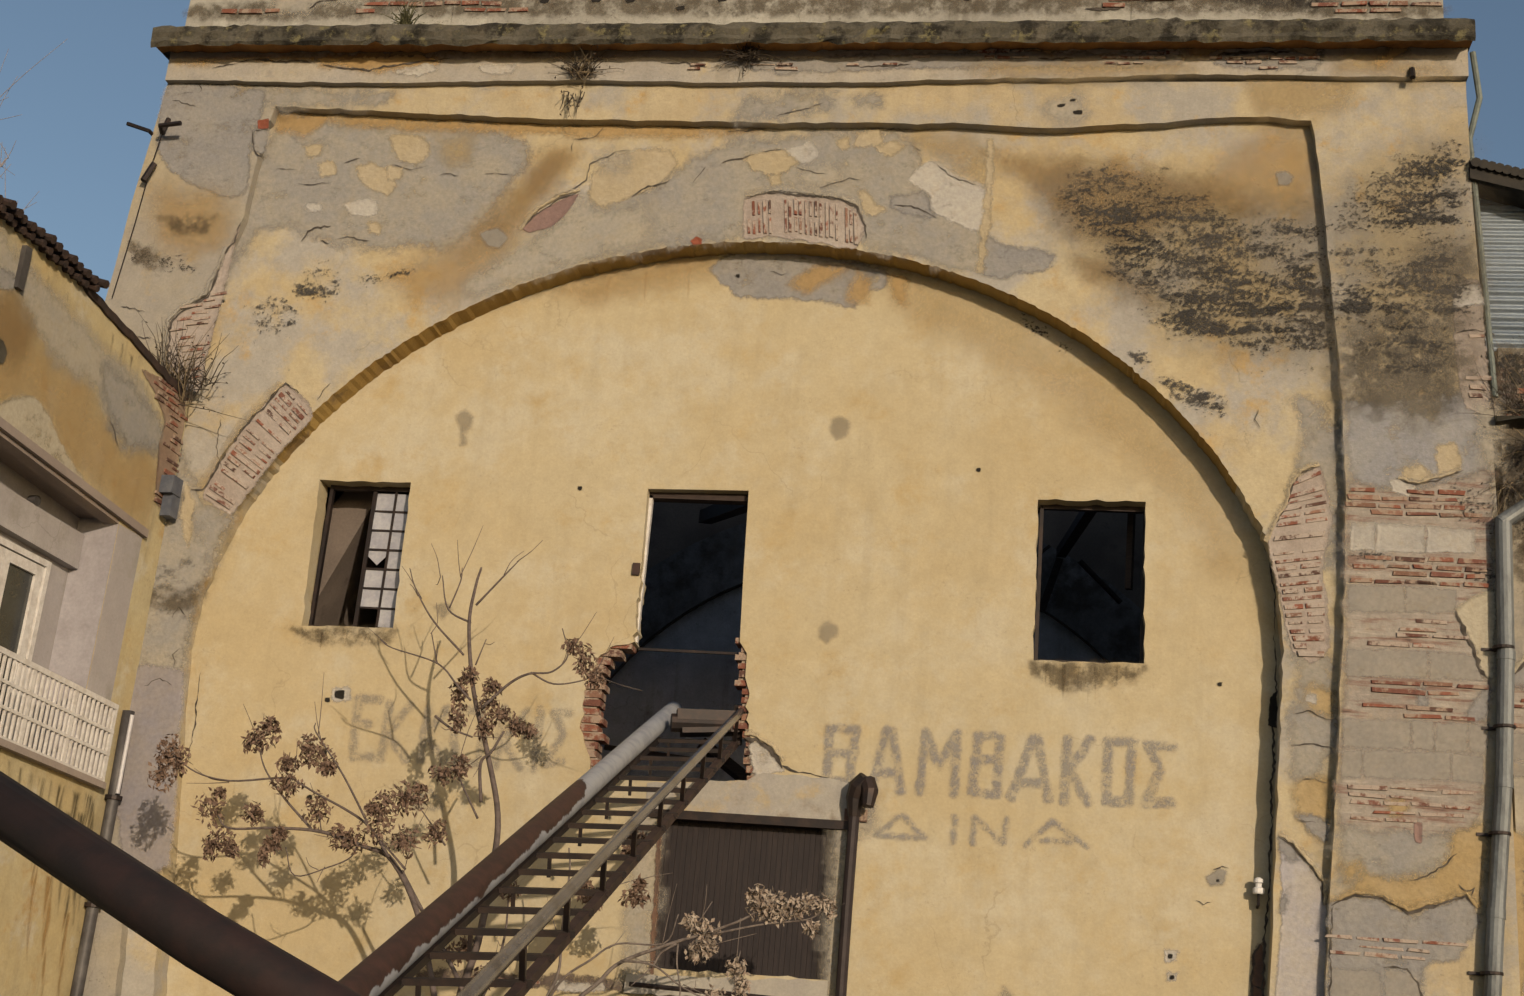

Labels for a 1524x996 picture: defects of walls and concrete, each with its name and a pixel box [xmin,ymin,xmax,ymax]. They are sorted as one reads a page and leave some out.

water stain [188,0,1371,20]
water stain [1390,5,1443,17]
peeling [463,48,1322,308]
water stain [1021,139,1481,417]
peeling [0,51,530,871]
spalling [580,644,636,769]
spalling [734,636,784,780]
spalling [1250,278,1524,996]